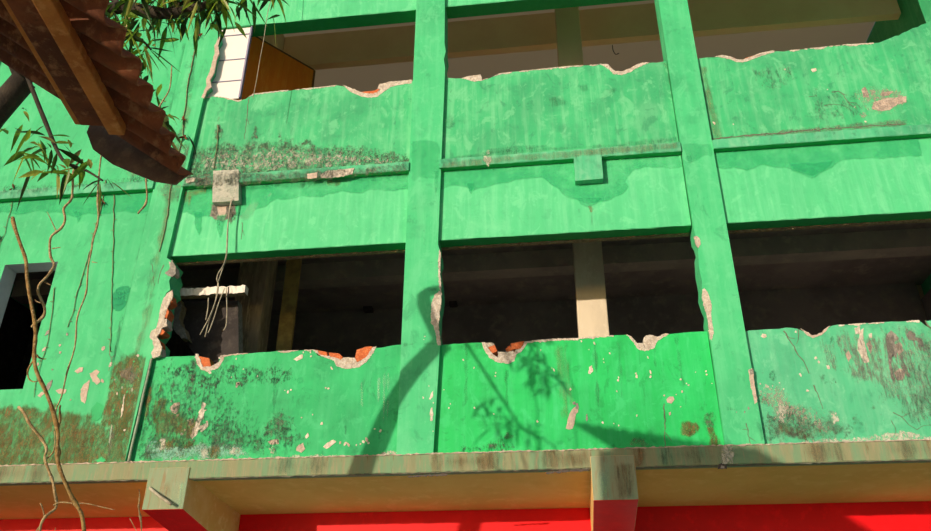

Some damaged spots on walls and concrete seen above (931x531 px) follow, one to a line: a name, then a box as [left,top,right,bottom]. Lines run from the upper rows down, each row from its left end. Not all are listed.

damp [163,125,409,197]
peeling [37,354,139,444]
spalling [150,290,177,359]
peeling [170,402,208,441]
spalling [194,353,248,374]
damp [138,362,333,460]
spalling [278,346,377,370]
spalling [481,335,614,377]
spalling [431,233,701,346]
spalling [626,333,668,359]
spalling [702,289,714,340]
crack [783,329,823,408]